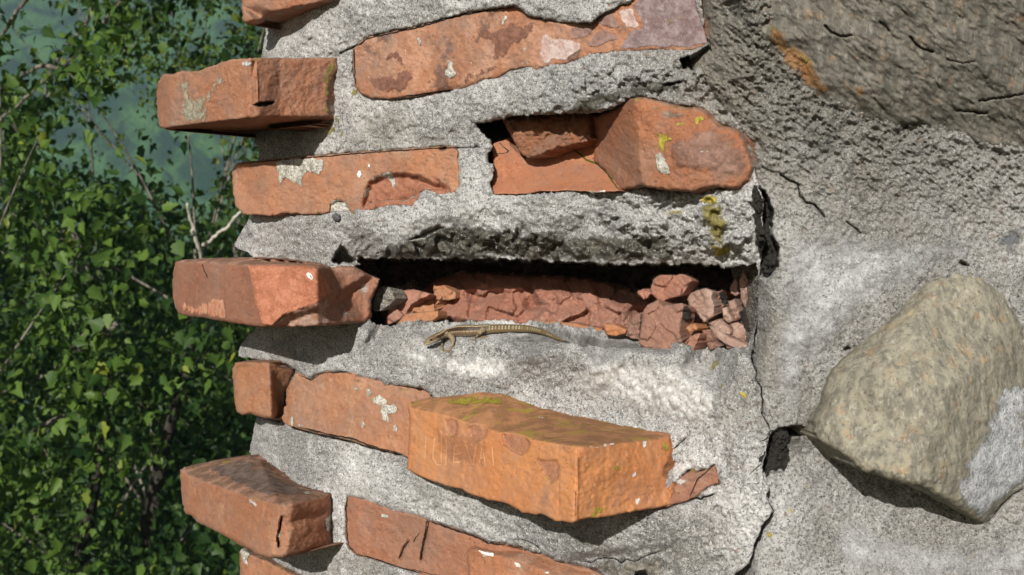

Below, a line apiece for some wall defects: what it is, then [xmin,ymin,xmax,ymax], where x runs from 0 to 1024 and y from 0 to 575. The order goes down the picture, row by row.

spalling [491,81,676,195]
crack [958,94,1023,113]
crack [781,175,860,233]
crack [747,350,774,558]